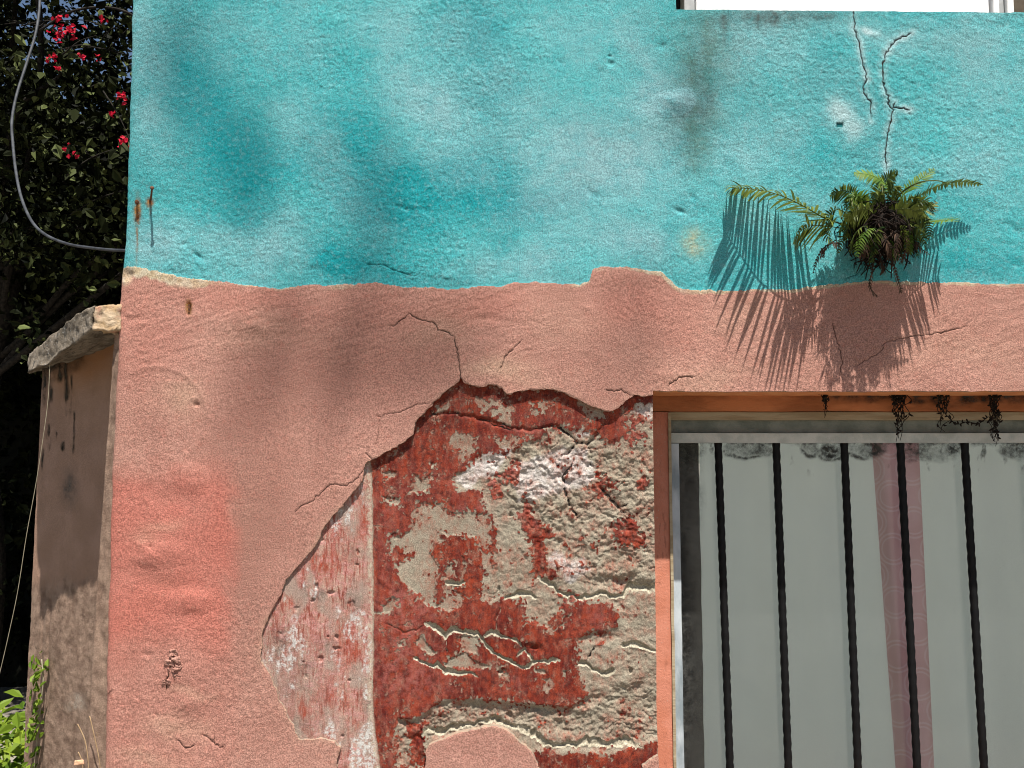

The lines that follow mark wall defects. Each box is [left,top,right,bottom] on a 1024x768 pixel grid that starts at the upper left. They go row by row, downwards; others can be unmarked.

crack [853,11,909,168]
crack [394,314,461,378]
crack [296,407,605,518]
spalling [261,378,658,768]
crack [390,577,656,677]